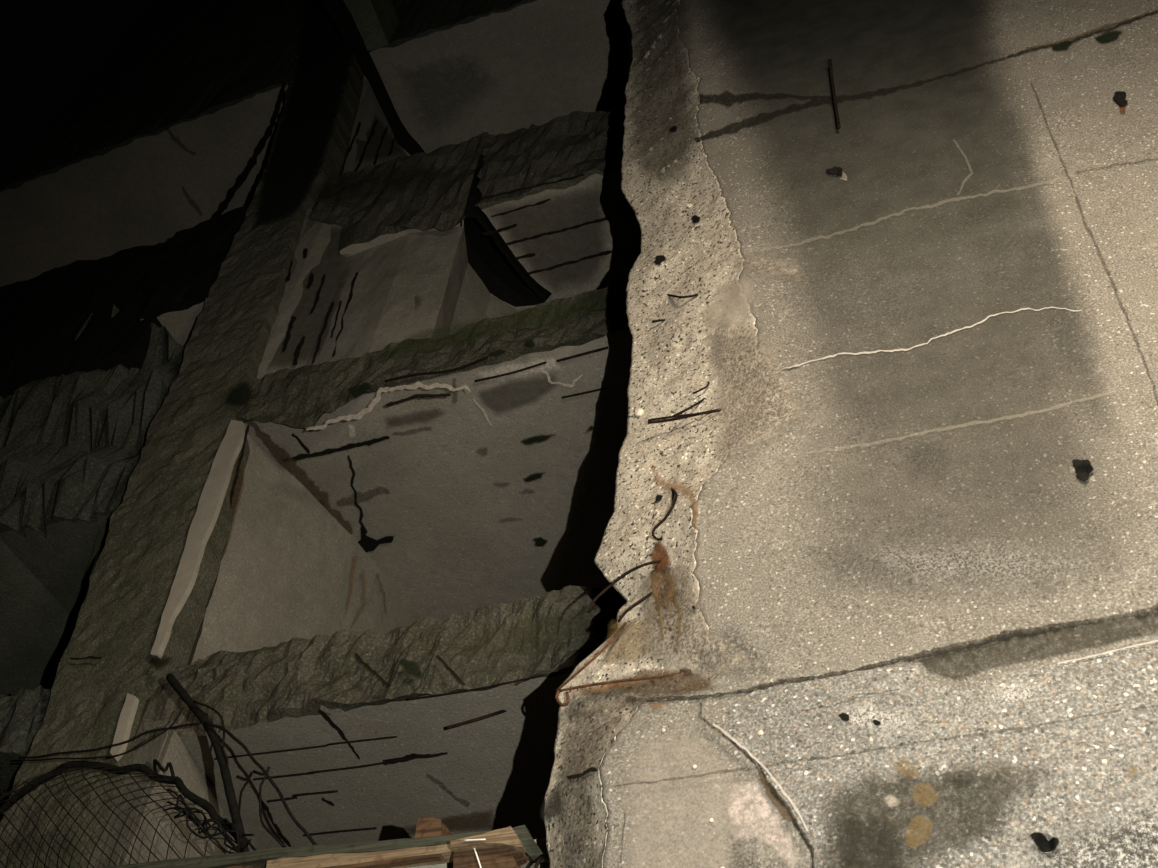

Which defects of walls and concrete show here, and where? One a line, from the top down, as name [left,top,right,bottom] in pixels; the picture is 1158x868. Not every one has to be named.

crack [695,10,1158,142]
leakage [722,0,1035,283]
spalling [483,199,612,275]
crack [765,307,1081,375]
crack [292,433,389,533]
spalling [306,346,608,437]
spalling [544,0,798,868]
rust [651,543,676,605]
spalling [407,674,544,700]
spalling [253,752,448,780]
crack [626,605,1158,868]
leakage [828,770,1034,868]